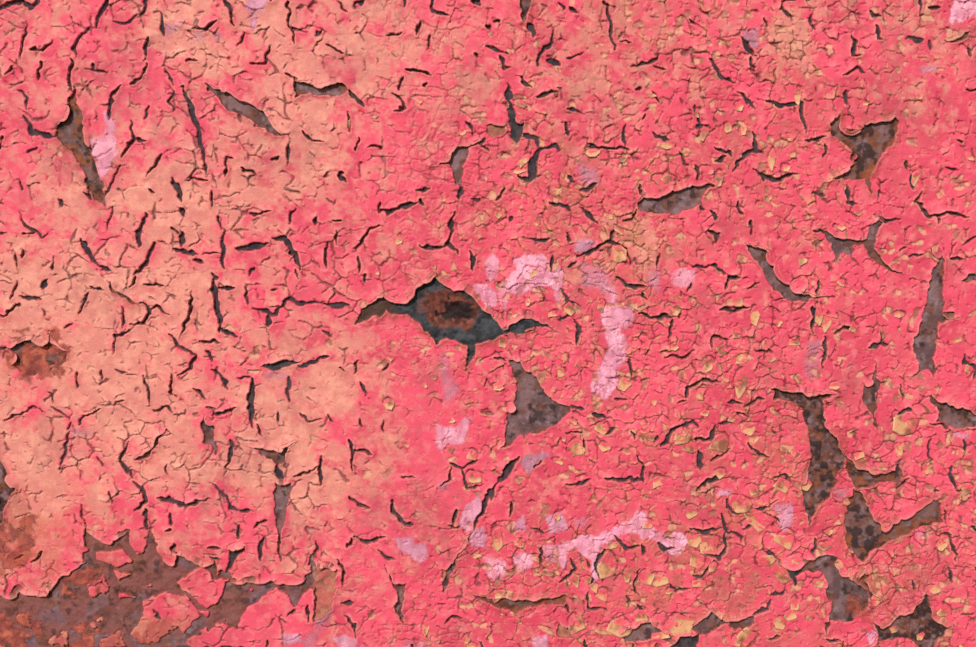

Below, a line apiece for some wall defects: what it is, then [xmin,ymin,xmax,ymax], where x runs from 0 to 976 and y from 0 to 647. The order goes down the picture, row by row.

crack [0,0,430,434]
crack [421,0,794,312]
crack [531,175,726,376]
peeling [825,110,901,194]
corrosion [0,327,70,379]
peeling [499,334,578,446]
corrosion [0,515,40,574]
corrosion [0,607,42,647]
corrosion [69,623,113,647]
peeling [0,525,337,647]
crack [567,377,780,591]
peeling [728,383,942,630]